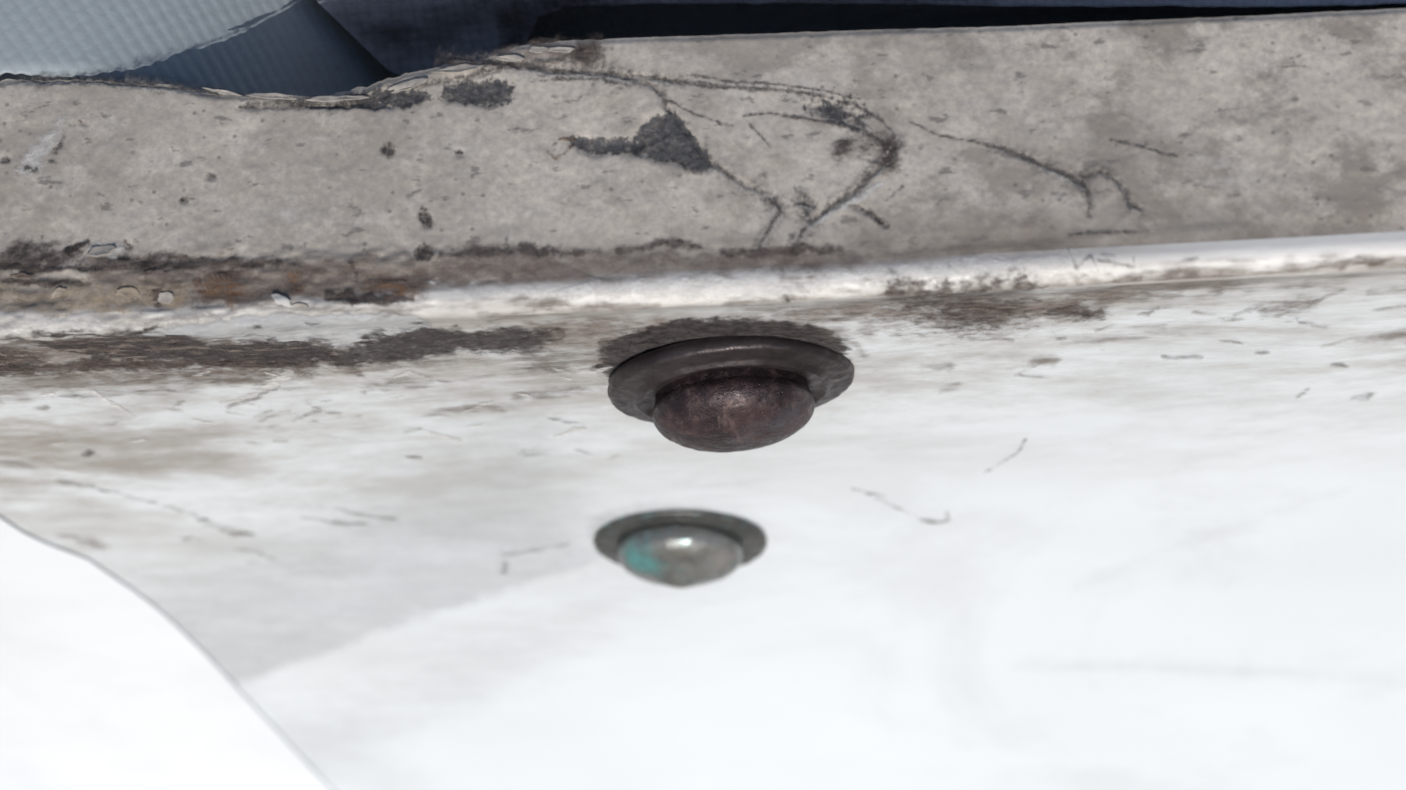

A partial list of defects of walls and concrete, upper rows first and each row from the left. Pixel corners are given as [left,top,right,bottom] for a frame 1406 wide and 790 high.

spalling [202,36,604,114]
spalling [559,113,712,174]
crack [441,54,1175,250]
damp [0,240,166,273]
damp [0,318,667,392]